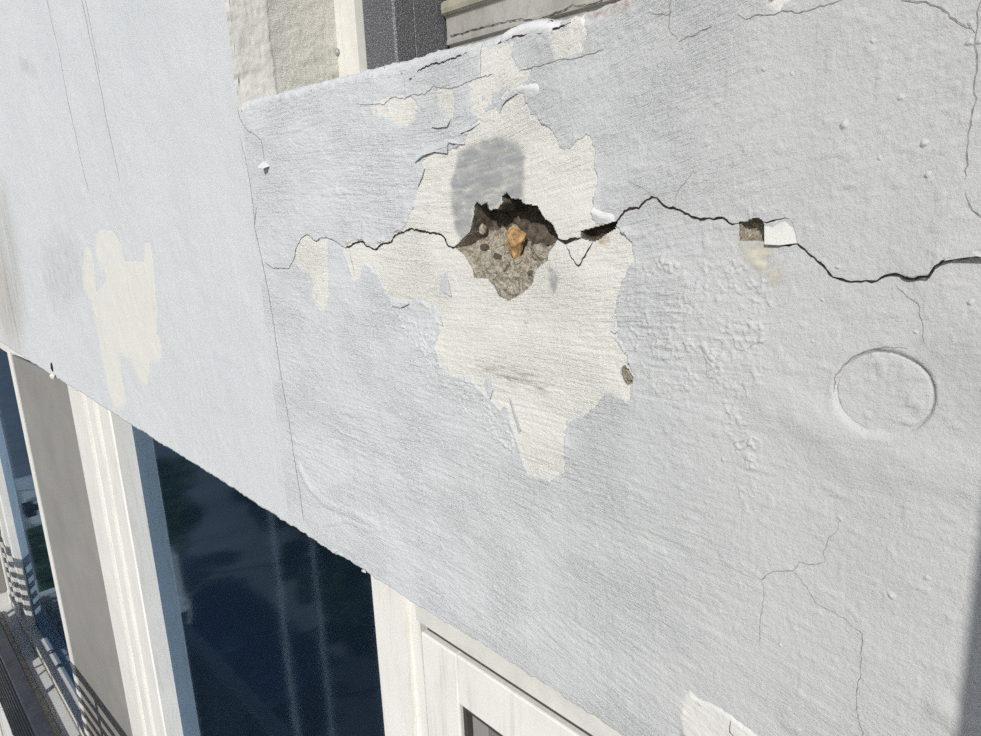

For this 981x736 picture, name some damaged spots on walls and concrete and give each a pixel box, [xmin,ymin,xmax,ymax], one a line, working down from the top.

crack [358,22,571,108]
crack [519,49,604,71]
crack [650,0,711,42]
crack [738,0,840,19]
crack [901,0,981,217]
peeling [82,229,162,410]
crack [238,112,460,522]
peeling [344,41,635,480]
crack [555,236,593,267]
crack [616,167,981,393]
peeling [667,691,757,736]
crack [755,524,864,736]